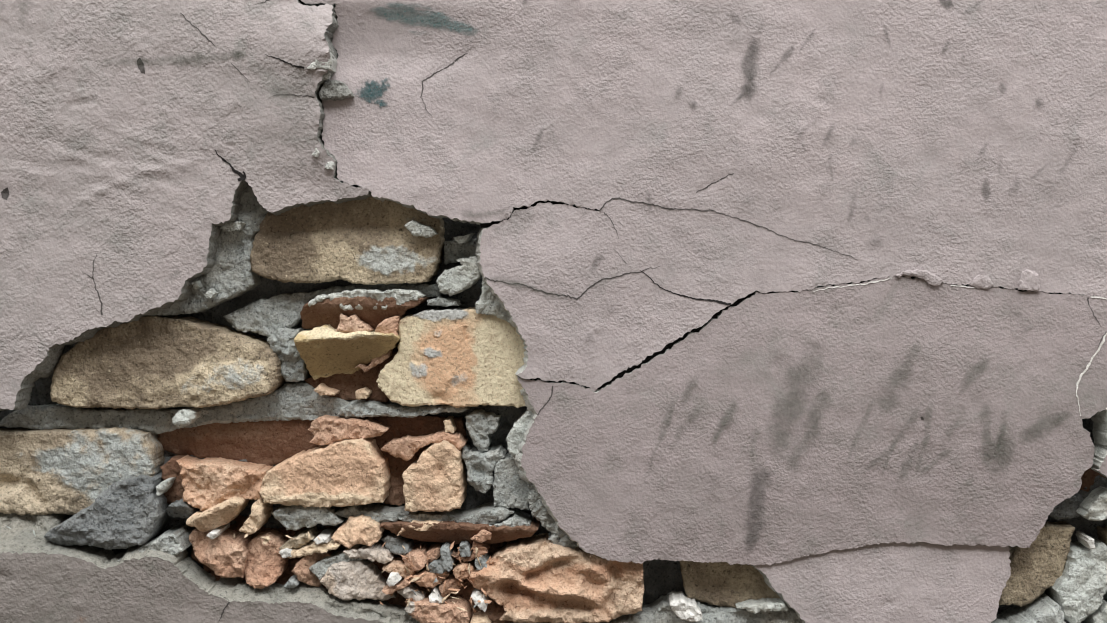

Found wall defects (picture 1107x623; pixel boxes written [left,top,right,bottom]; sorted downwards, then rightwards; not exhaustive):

crack [180,13,248,80]
crack [265,54,304,69]
crack [215,150,246,181]
crack [480,173,915,415]
crack [951,284,1107,416]
flaking render [0,186,577,623]
flaking render [1082,418,1095,445]
flaking render [991,475,1107,623]
flaking render [582,559,802,623]